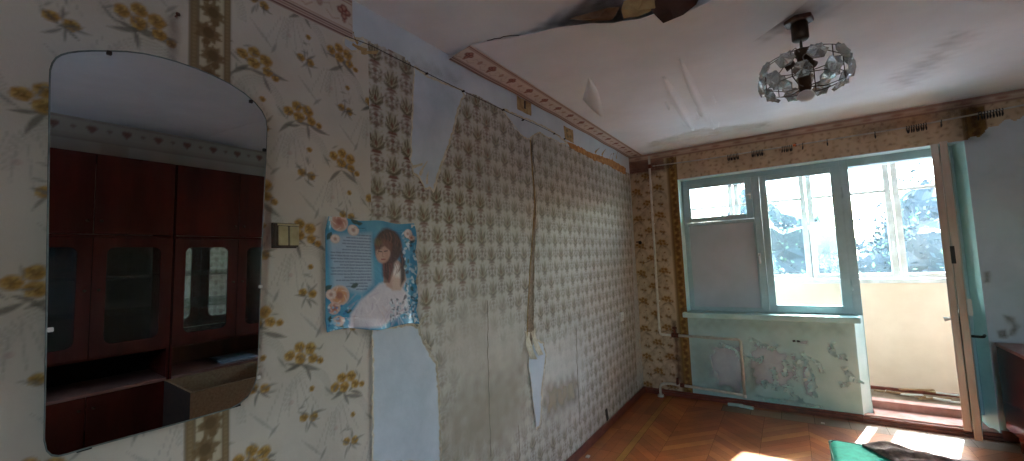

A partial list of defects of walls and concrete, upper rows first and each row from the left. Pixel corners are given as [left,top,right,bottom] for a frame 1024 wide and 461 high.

peeling [569,0,698,23]
flaking render [343,0,626,193]
peeling [370,313,442,461]
peeling [528,339,547,430]